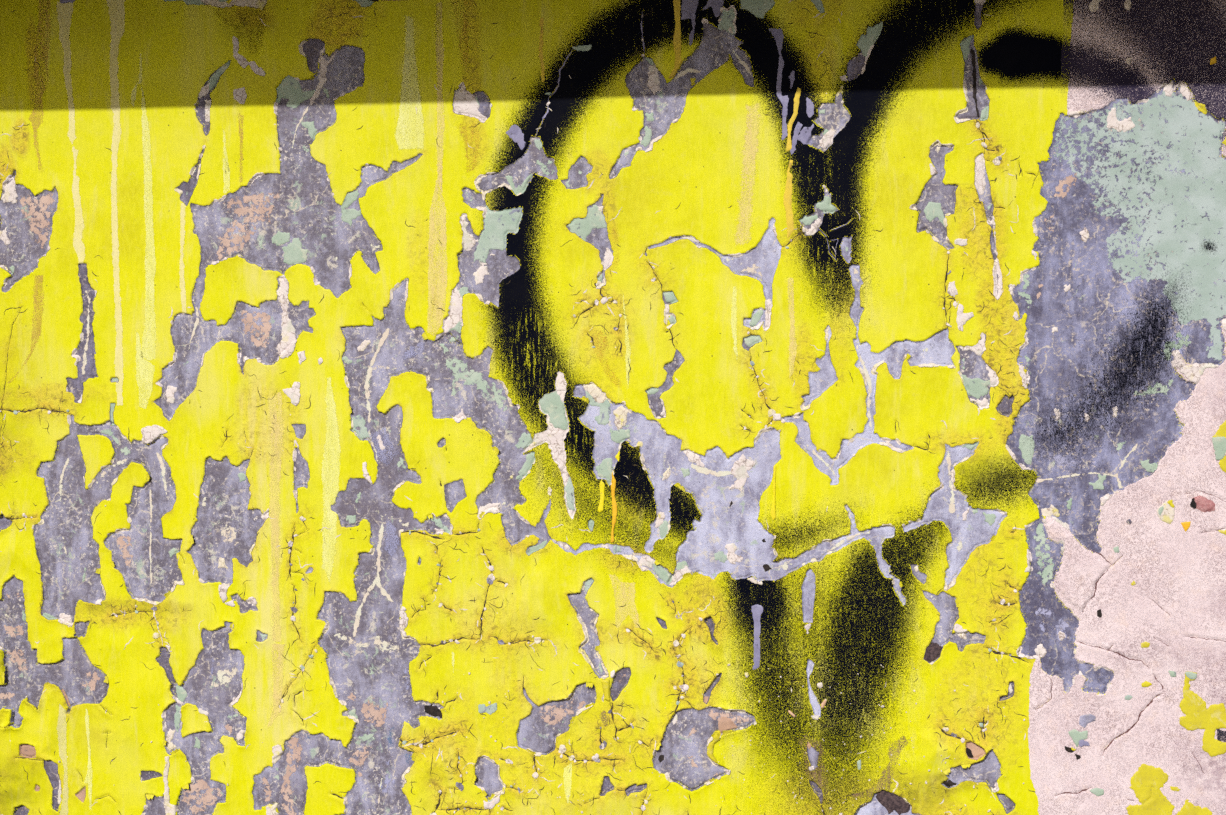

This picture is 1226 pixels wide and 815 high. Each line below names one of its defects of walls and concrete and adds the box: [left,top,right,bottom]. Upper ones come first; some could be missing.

crack [326,2,376,46]
peeling [609,0,775,179]
crack [788,0,843,79]
peeling [811,0,825,13]
peeling [809,21,883,152]
peeling [954,0,990,123]
peeling [0,36,423,815]
crack [222,371,311,476]
peeling [252,80,1226,815]
crack [895,330,1025,453]
crack [399,465,738,815]
crack [719,762,854,815]